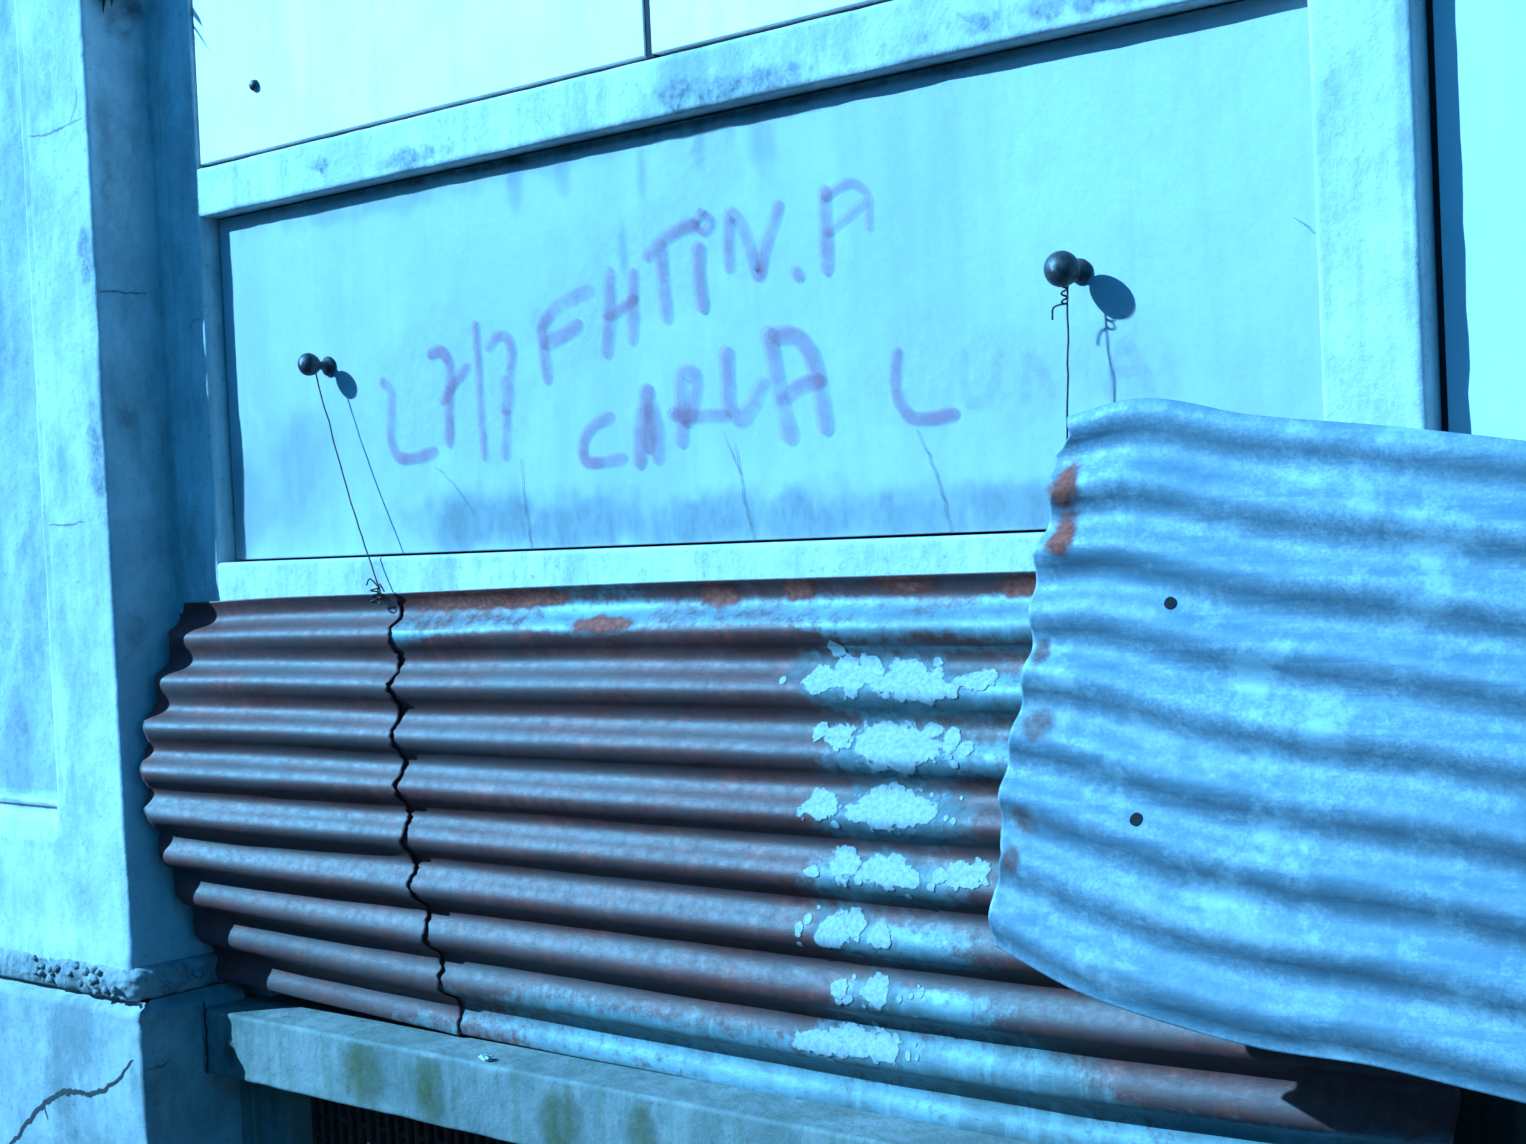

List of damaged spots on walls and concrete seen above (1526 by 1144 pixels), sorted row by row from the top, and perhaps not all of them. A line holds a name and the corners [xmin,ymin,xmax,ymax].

corrosion [1045,465,1078,555]
corrosion [399,588,571,612]
corrosion [1002,574,1036,598]
peeling [779,640,999,900]
peeling [795,905,891,951]
crack [201,1001,209,1073]
peeling [792,972,925,1067]
crack [9,1060,168,1144]